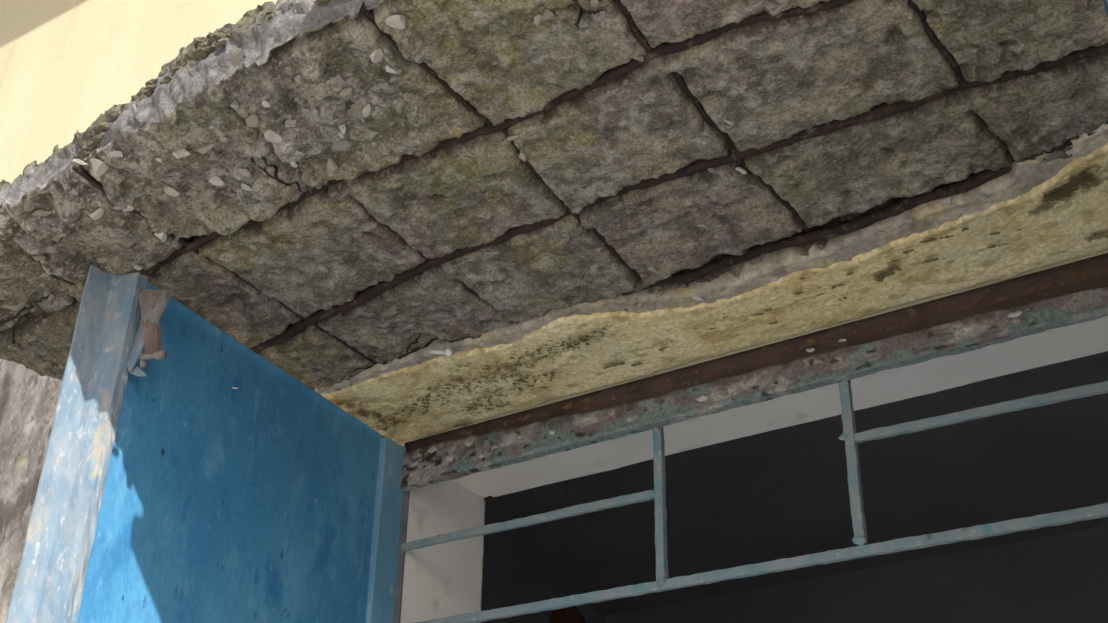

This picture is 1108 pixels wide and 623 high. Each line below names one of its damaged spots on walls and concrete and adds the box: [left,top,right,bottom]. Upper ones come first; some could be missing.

spalling [0,0,1108,395]
water stain [1028,164,1102,216]
water stain [874,227,970,283]
water stain [366,325,618,431]
peeling [410,447,454,470]